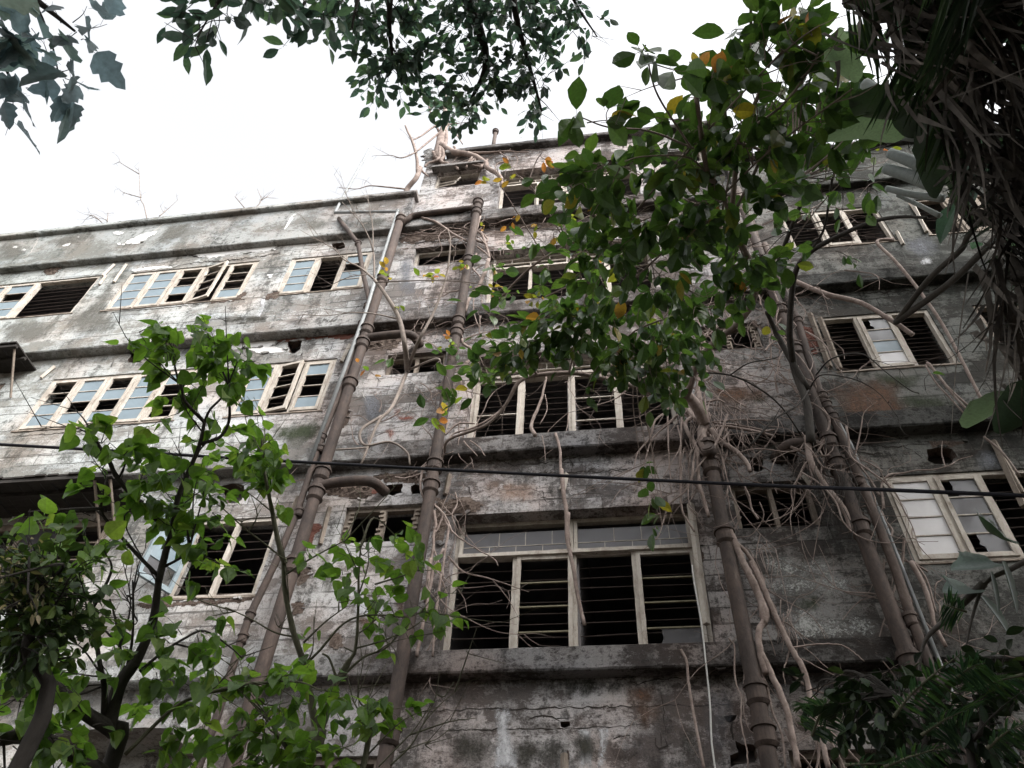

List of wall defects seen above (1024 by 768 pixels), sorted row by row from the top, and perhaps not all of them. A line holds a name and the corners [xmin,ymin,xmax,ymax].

peeling [113,231,157,245]
spalling [914,439,968,469]
damp [454,711,604,767]
crack [413,677,743,754]